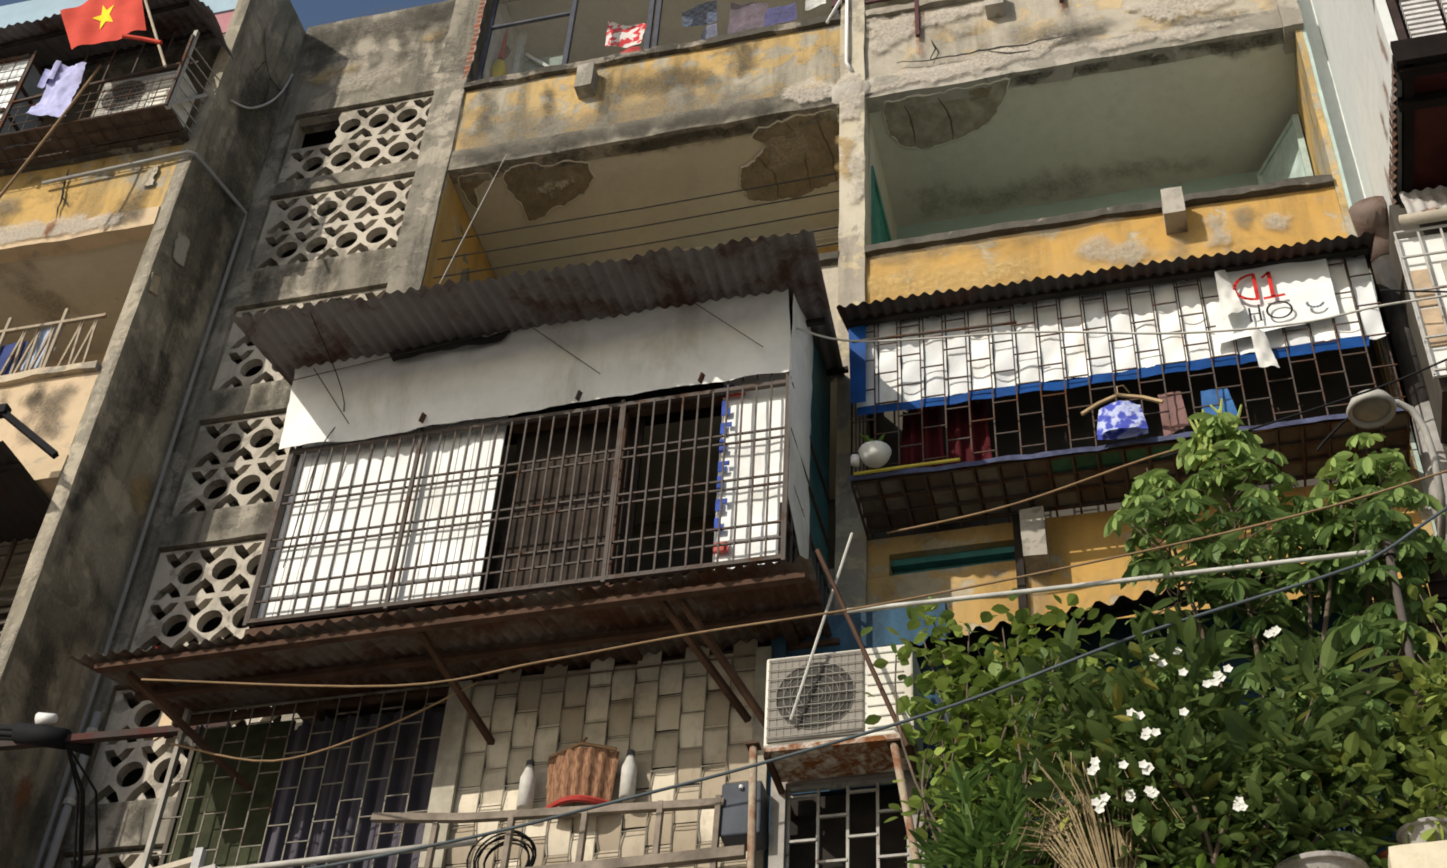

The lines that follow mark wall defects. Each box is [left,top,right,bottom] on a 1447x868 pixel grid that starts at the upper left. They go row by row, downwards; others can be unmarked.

leakage [171,70,278,322]
flaking render [457,160,596,222]
leakage [459,41,790,161]
flaking render [738,37,1062,203]
peeling [1079,237,1147,261]
leakage [25,343,176,724]